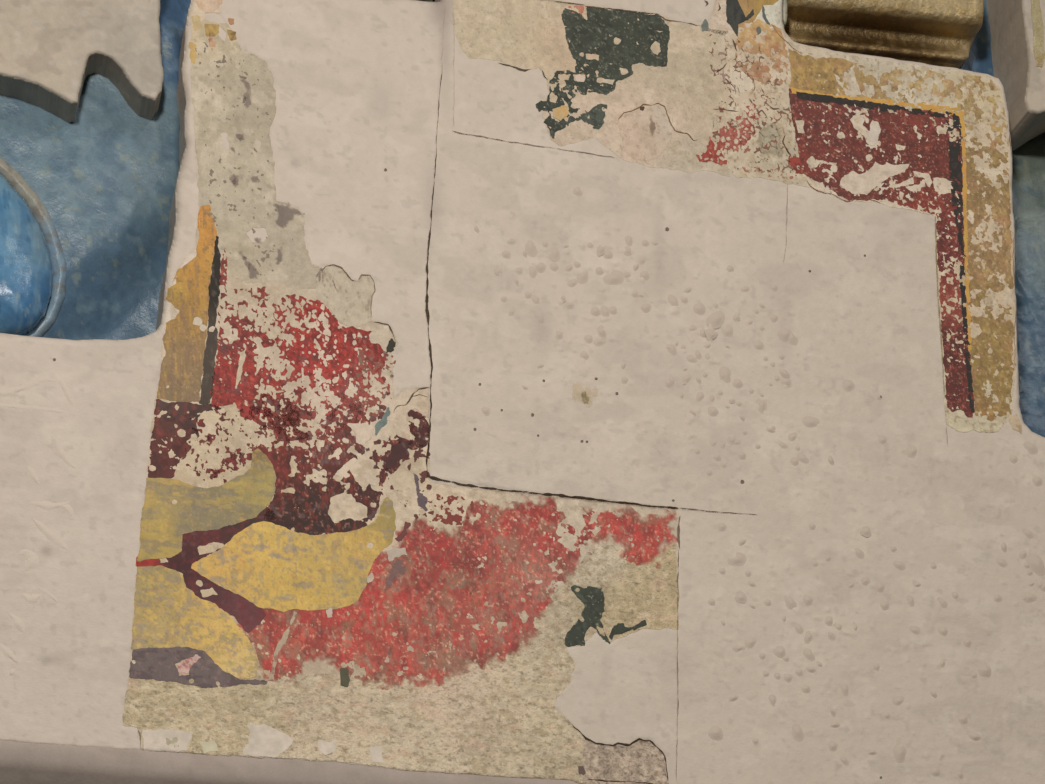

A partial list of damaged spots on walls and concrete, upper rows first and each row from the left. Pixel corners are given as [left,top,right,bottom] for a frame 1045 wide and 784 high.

peeling [122,0,680,784]
crack [425,13,757,781]
peeling [452,0,1022,434]